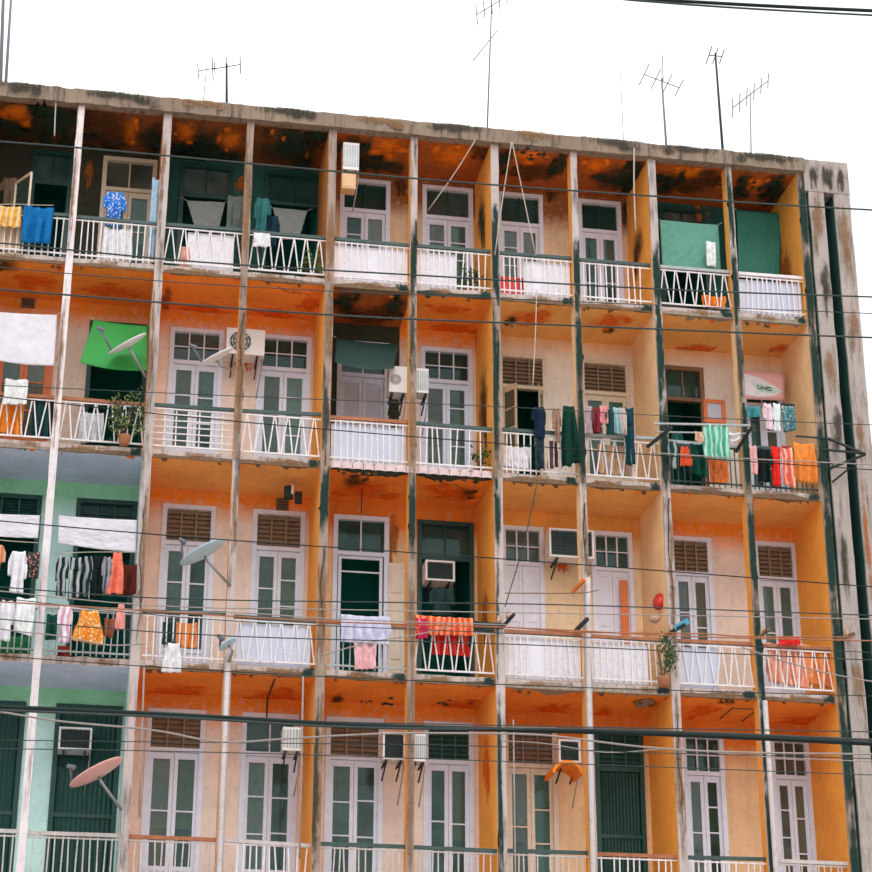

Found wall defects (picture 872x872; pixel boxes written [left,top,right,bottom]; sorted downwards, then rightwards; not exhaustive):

leakage [498,149,567,181]
leakage [590,137,646,225]
leakage [731,150,793,163]
leakage [325,207,418,372]
leakage [642,243,670,513]
leakage [656,169,786,493]
leakage [795,167,844,414]
leakage [748,508,758,591]
leakage [809,408,864,804]
leakage [719,608,767,779]
leakage [765,794,773,872]
leakage [848,817,859,872]